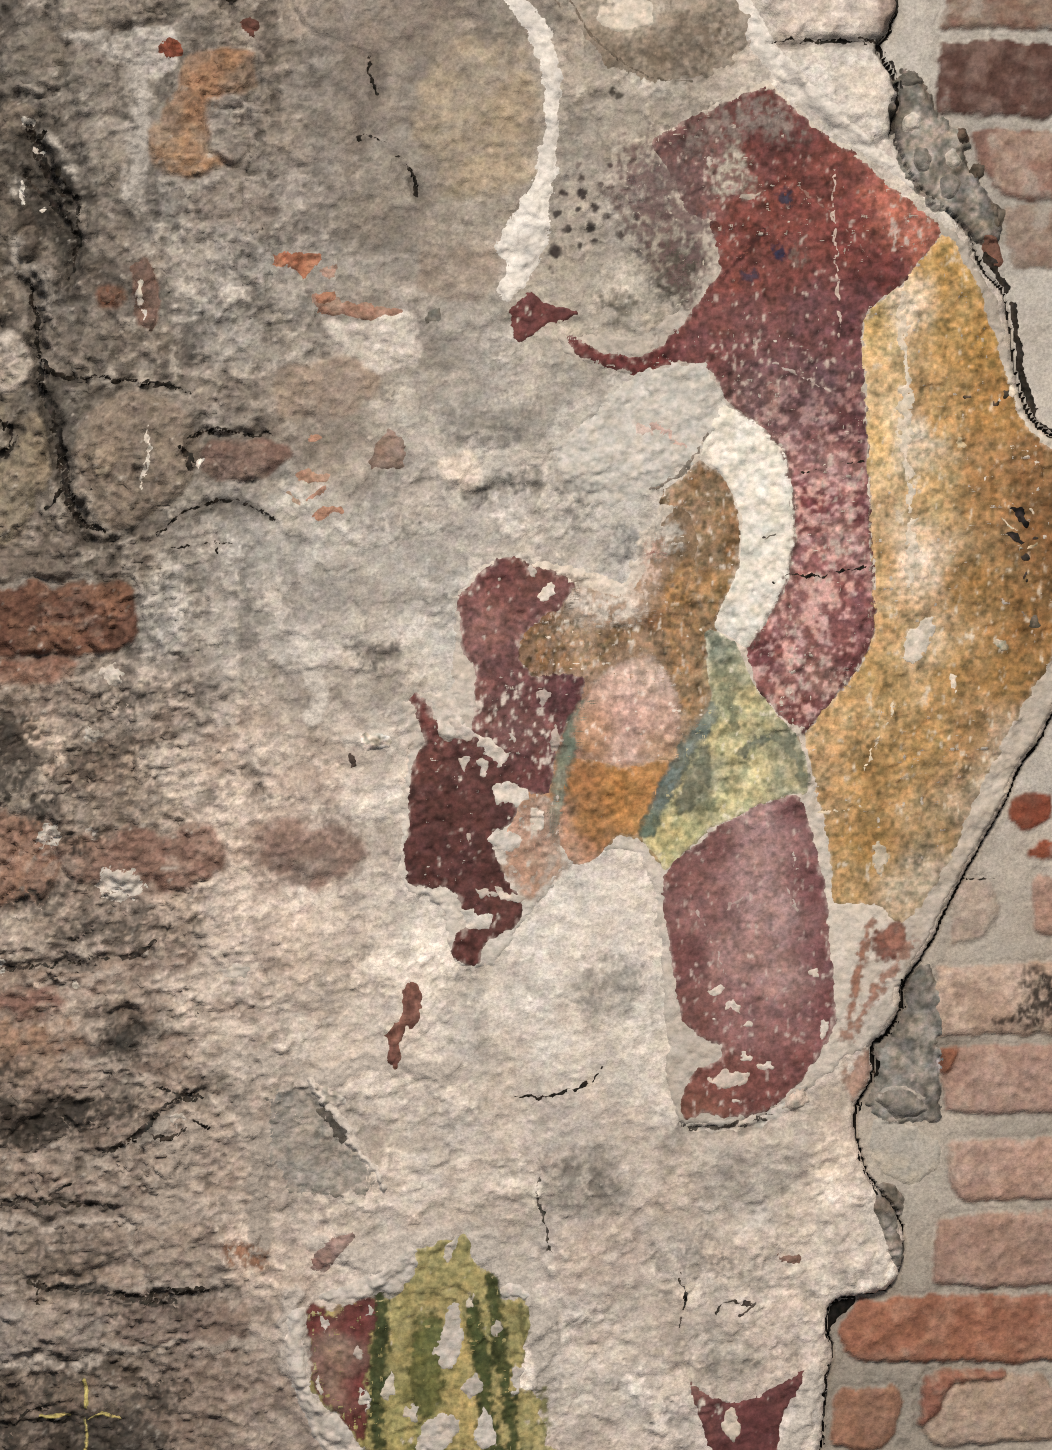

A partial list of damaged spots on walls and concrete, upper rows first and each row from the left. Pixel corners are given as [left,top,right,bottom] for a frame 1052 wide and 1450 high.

spalling [158,37,183,59]
flaking render [98,258,161,332]
spalling [272,251,403,321]
crack [970,239,1052,438]
crack [44,364,192,395]
peeling [895,291,919,588]
crack [156,497,276,549]
crack [772,565,867,584]
peeling [903,616,936,664]
peeling [707,984,753,1027]
crack [819,714,1052,1450]
flaking render [265,1077,388,1198]